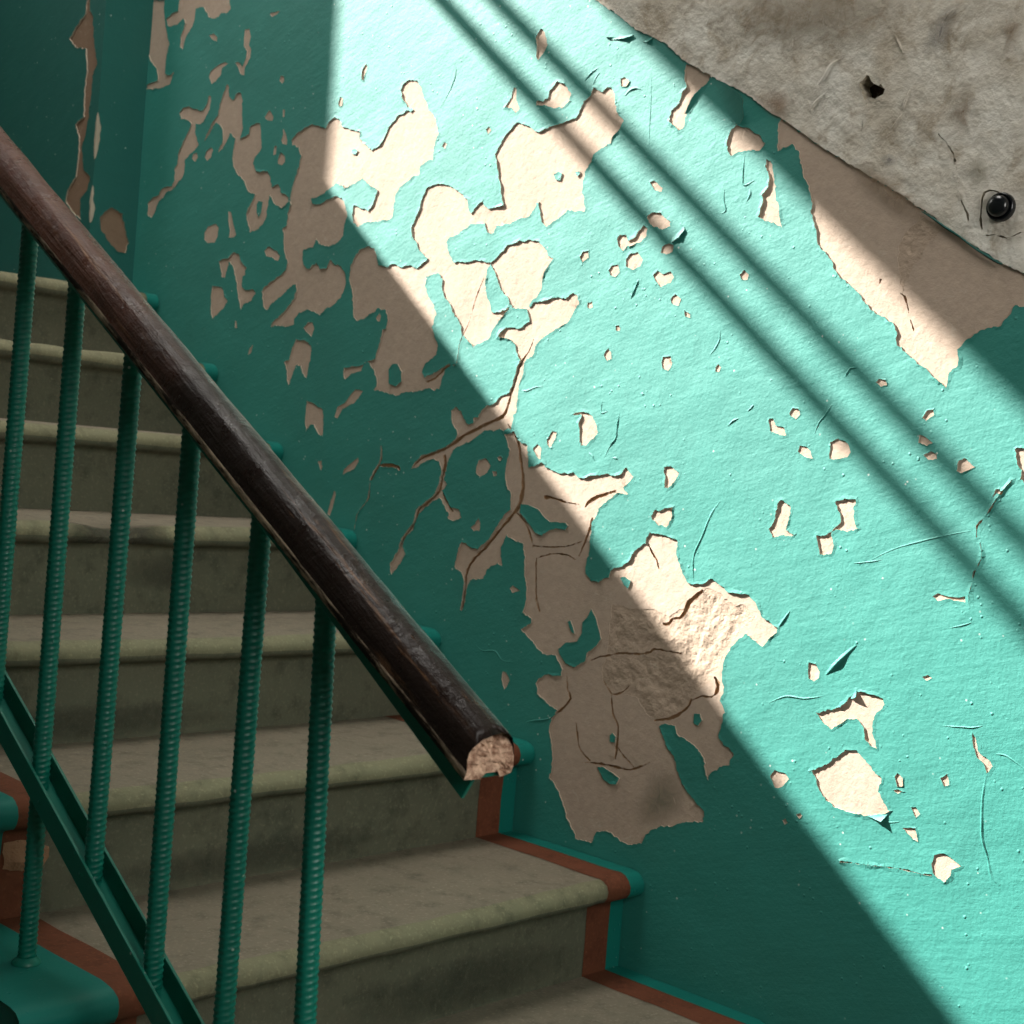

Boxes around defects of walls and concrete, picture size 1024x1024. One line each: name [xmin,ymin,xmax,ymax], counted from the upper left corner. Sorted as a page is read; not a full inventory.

peeling [146,0,232,93]
peeling [65,0,131,254]
peeling [667,62,1024,391]
crack [426,279,484,383]
peeling [146,27,780,849]
crack [352,340,616,612]
peeling [766,497,797,540]
peeling [813,494,861,557]
crack [965,477,1016,609]
peeling [808,687,905,822]
crack [838,857,934,877]
peeling [927,850,964,885]